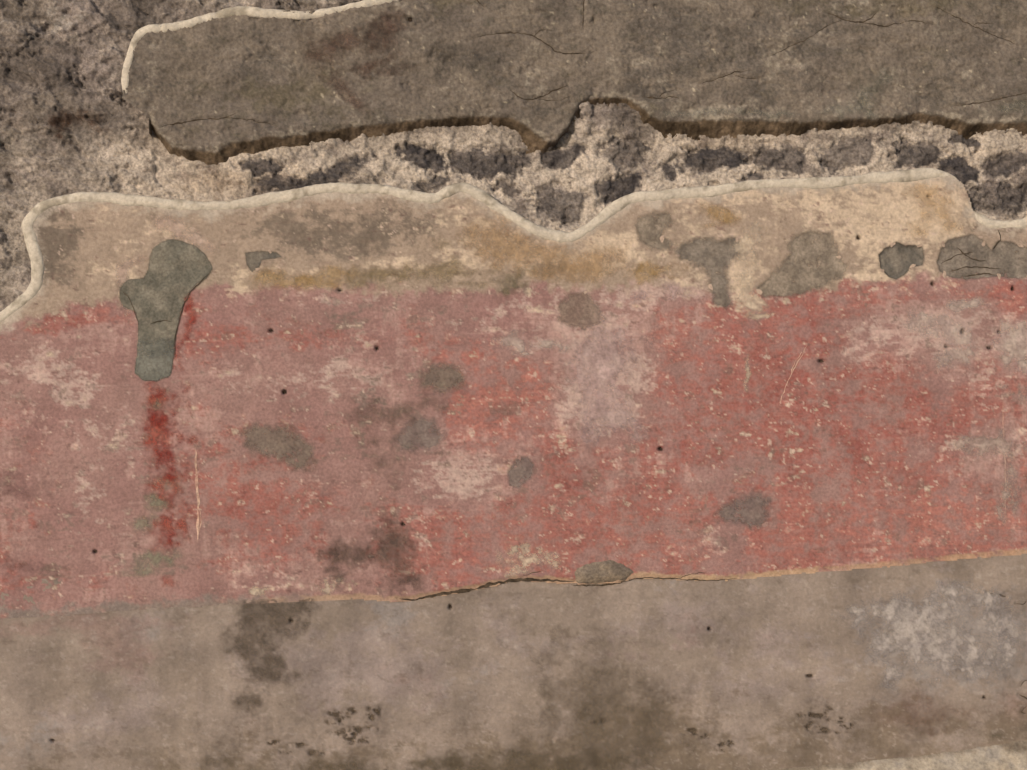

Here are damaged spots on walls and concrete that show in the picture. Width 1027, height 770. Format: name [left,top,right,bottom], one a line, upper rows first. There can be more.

crack [479,29,597,54]
crack [768,6,1017,57]
crack [513,84,569,101]
crack [957,93,1026,106]
peeling [245,249,281,272]
peeling [636,212,846,319]
spalling [879,242,924,279]
peeling [931,230,1027,290]
crack [403,571,573,601]
crack [623,572,737,582]
water stain [234,600,311,680]